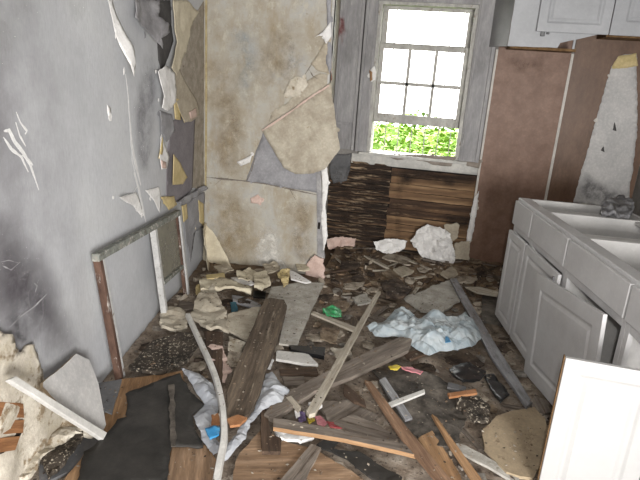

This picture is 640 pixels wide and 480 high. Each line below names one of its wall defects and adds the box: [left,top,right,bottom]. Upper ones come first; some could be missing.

flaking render [160,1,204,204]
flaking render [284,74,308,98]
peeling [573,53,638,205]
flaking render [0,331,64,480]